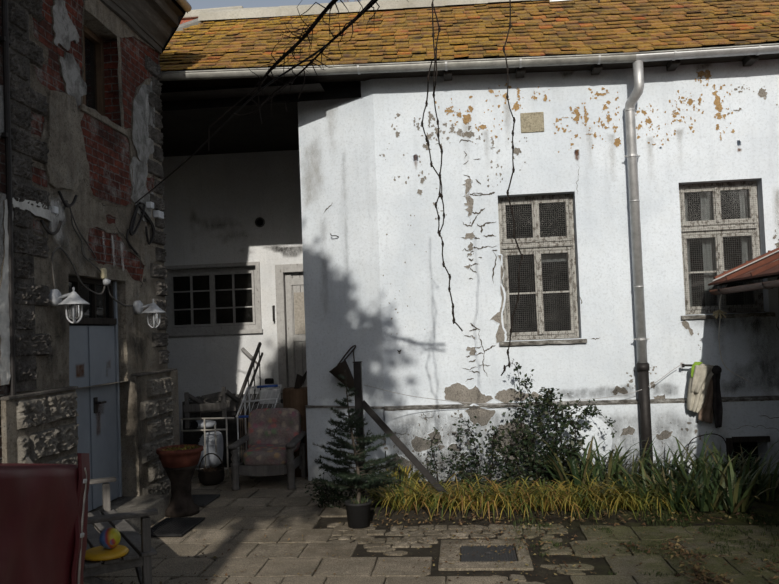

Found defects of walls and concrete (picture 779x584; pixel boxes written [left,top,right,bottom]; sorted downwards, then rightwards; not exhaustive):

spalling [29,0,160,286]
peeling [394,83,550,196]
peeling [553,86,622,151]
peeling [635,68,768,149]
crack [437,139,497,284]
spalling [489,254,507,344]
crack [463,323,496,382]
spalling [611,370,635,396]
spalling [382,382,543,477]
spalling [618,424,636,438]